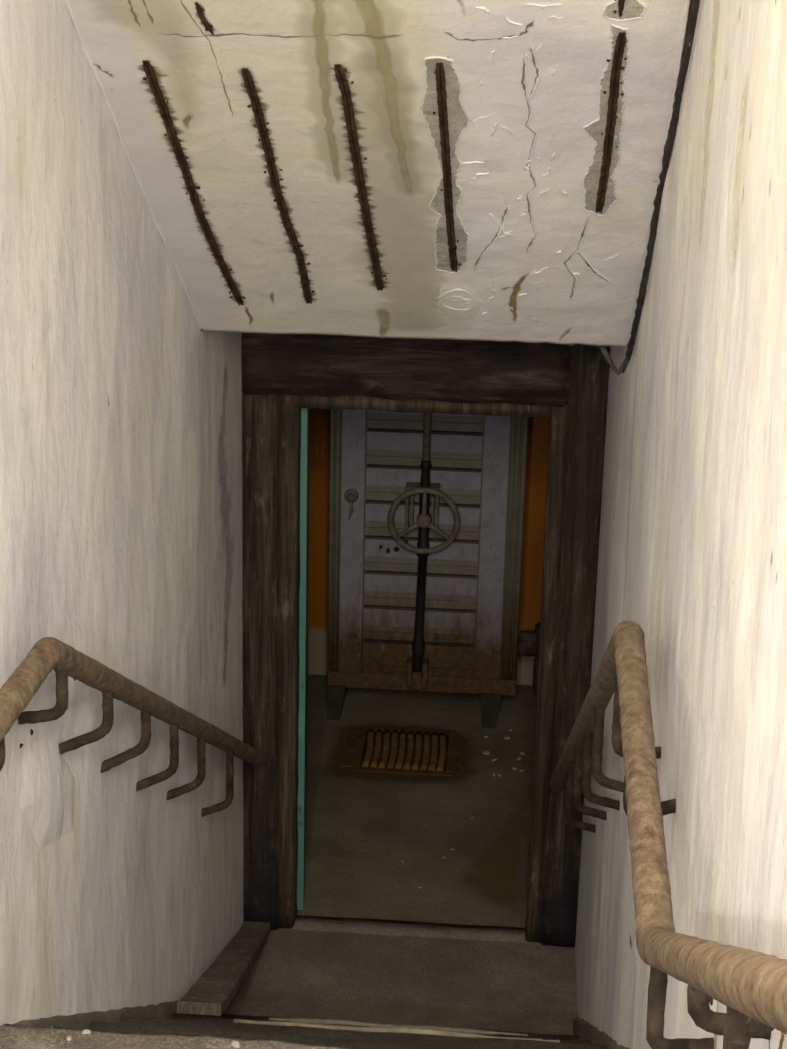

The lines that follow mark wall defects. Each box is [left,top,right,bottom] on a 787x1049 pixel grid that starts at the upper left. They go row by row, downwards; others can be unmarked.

crack [128,0,400,115]
damp [314,0,339,178]
damp [358,0,411,192]
spalling [420,56,513,274]
crack [447,22,541,270]
crack [564,214,613,301]
spalling [582,0,646,217]